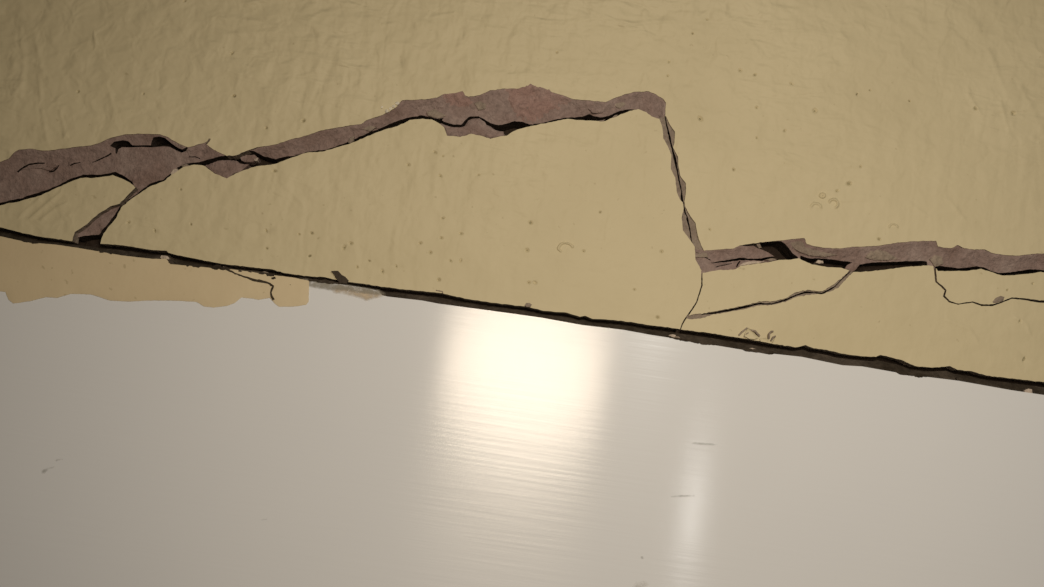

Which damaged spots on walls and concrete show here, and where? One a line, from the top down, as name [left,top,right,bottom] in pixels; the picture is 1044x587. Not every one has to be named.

peeling [0,84,666,308]
crack [0,232,1044,395]
crack [658,117,708,258]
spalling [688,238,1044,316]